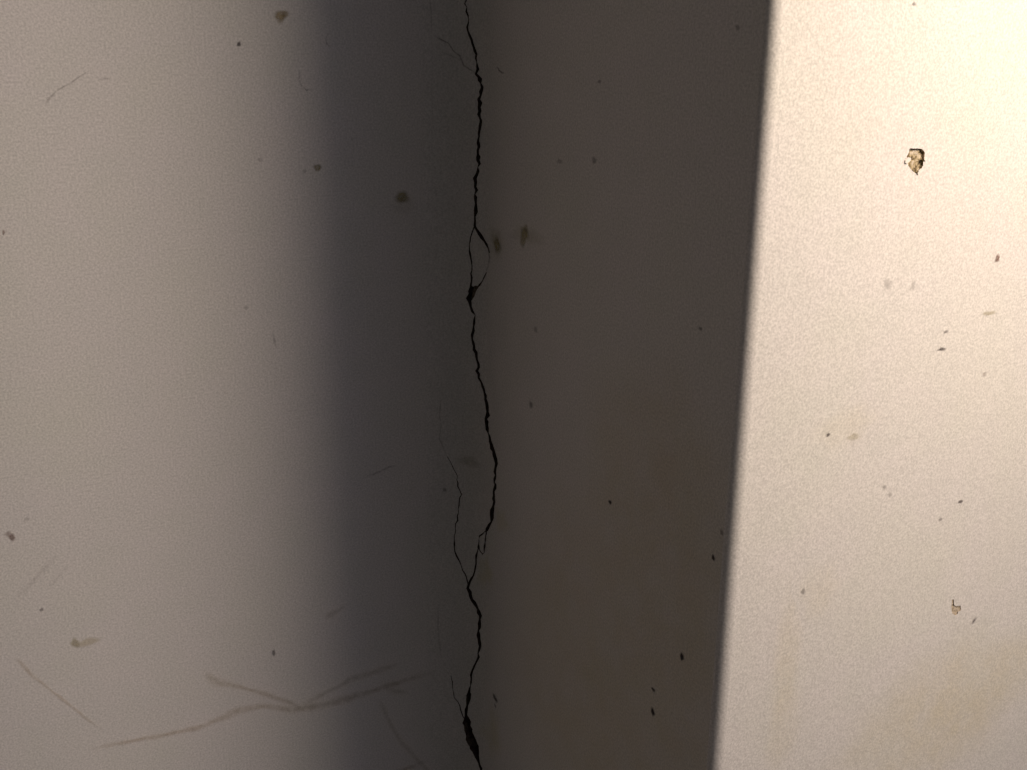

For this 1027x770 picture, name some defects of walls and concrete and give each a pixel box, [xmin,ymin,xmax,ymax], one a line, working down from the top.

crack [440,0,498,770]